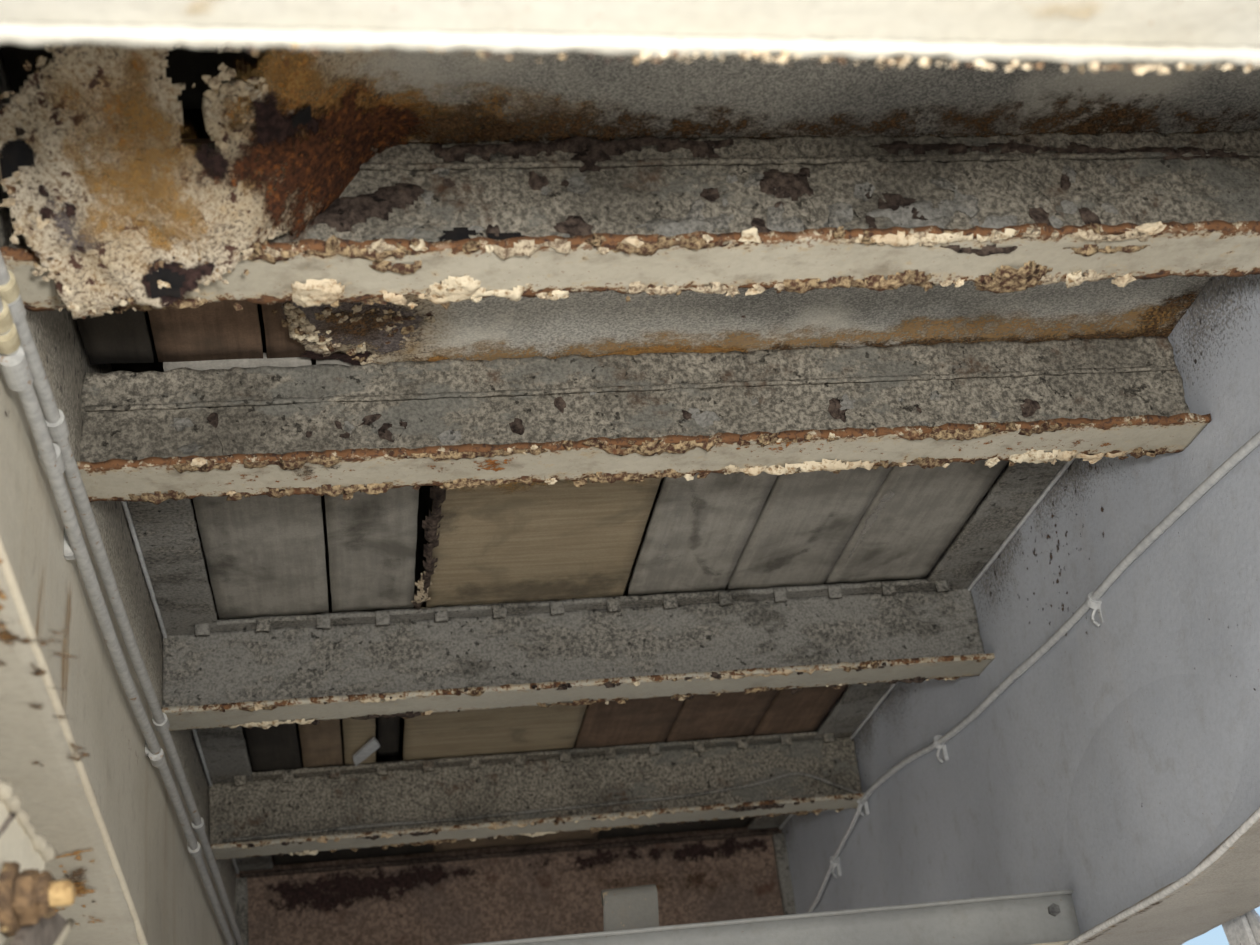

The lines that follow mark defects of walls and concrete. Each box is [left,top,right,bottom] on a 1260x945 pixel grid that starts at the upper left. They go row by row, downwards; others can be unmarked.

peeling [192,45,269,153]
spalling [0,140,35,180]
spalling [38,185,76,221]
corrosion [0,45,1260,319]
spalling [131,202,317,301]
peeling [366,223,525,275]
peeling [554,215,667,255]
peeling [738,163,1166,294]
peeling [508,290,569,301]
peeling [335,414,408,456]
peeling [507,418,546,455]
peeling [804,398,847,442]